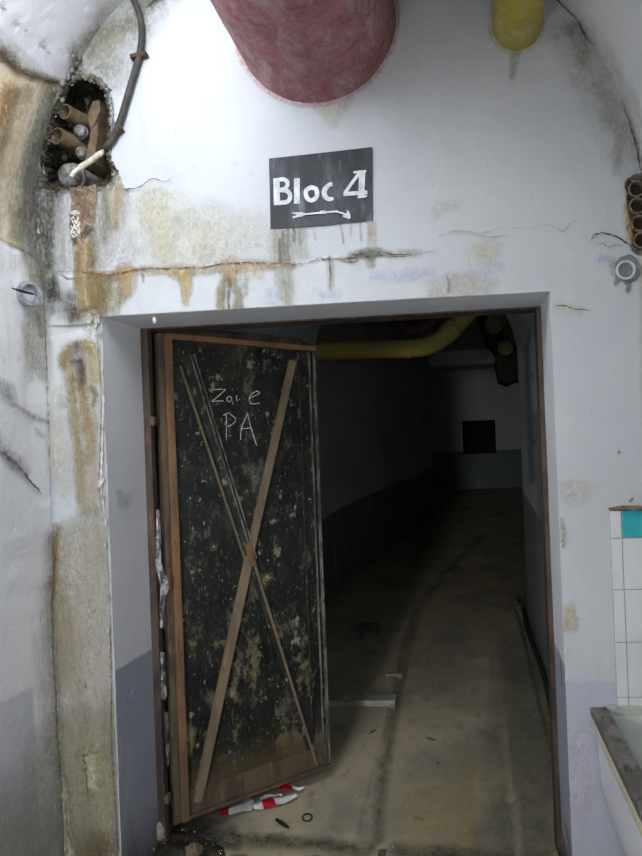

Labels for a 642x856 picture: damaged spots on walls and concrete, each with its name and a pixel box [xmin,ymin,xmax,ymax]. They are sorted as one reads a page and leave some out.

water stain [69,0,153,83]
crack [557,0,594,46]
spalling [29,54,123,245]
crack [623,102,642,179]
water stain [22,98,83,375]
corrosion [74,234,293,319]
crack [0,221,574,276]
crack [591,232,638,253]
crack [0,304,88,850]
crack [110,623,118,848]